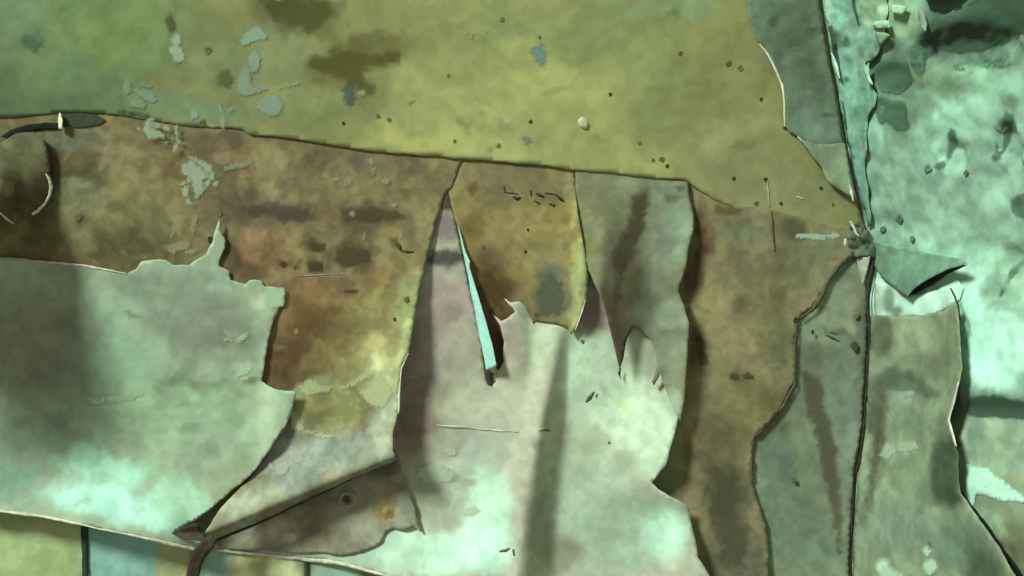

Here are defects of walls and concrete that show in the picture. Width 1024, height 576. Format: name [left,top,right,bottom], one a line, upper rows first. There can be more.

peeling [169,34,185,62]
peeling [237,26,298,116]
leakage [309,52,398,106]
peeling [123,80,184,152]
flaking render [824,0,927,233]
peeling [165,156,253,255]
peeling [264,288,285,309]
flaking render [874,279,963,317]
peeling [299,370,392,408]
crack [750,257,876,576]